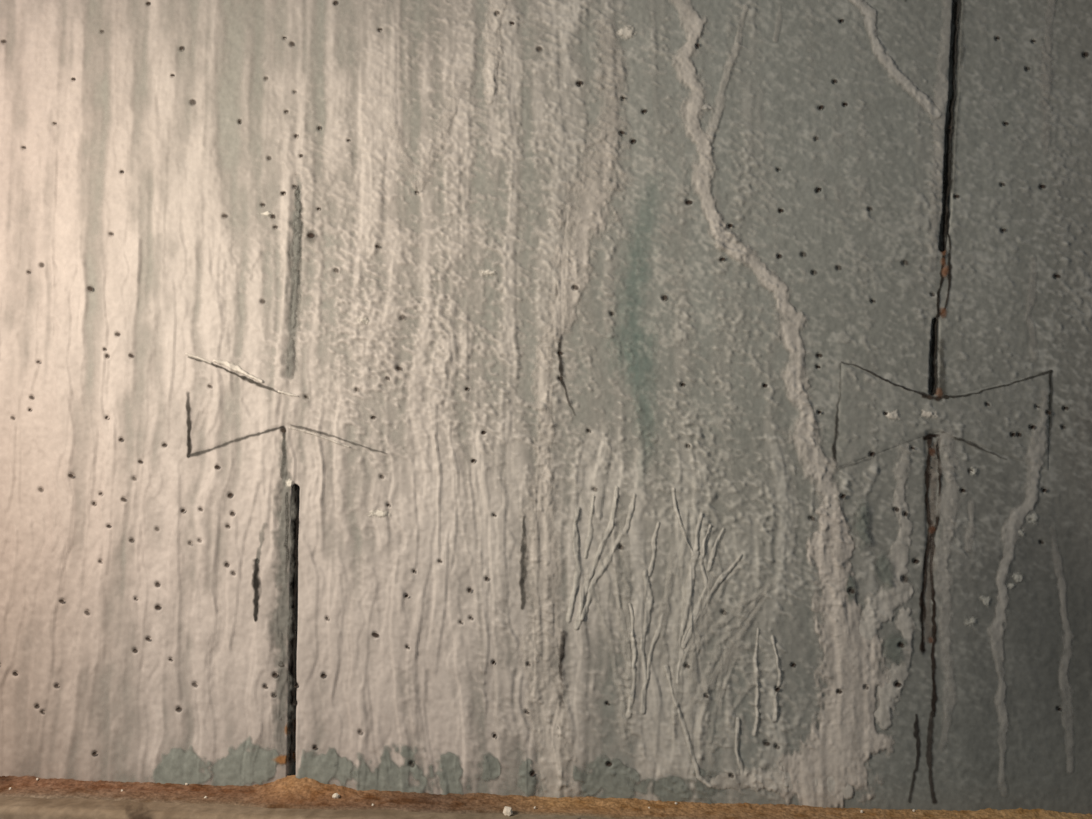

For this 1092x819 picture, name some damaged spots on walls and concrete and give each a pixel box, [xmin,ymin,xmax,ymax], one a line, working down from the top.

efflorescence [483,0,506,104]
efflorescence [850,0,951,234]
crack [930,0,960,394]
crack [252,427,299,764]
water stain [521,79,635,798]
water stain [617,522,665,718]
water stain [664,0,915,808]
crack [909,434,942,803]
efflorescence [937,431,957,647]
efflorescence [981,401,1048,733]
efflorescence [1059,581,1072,689]